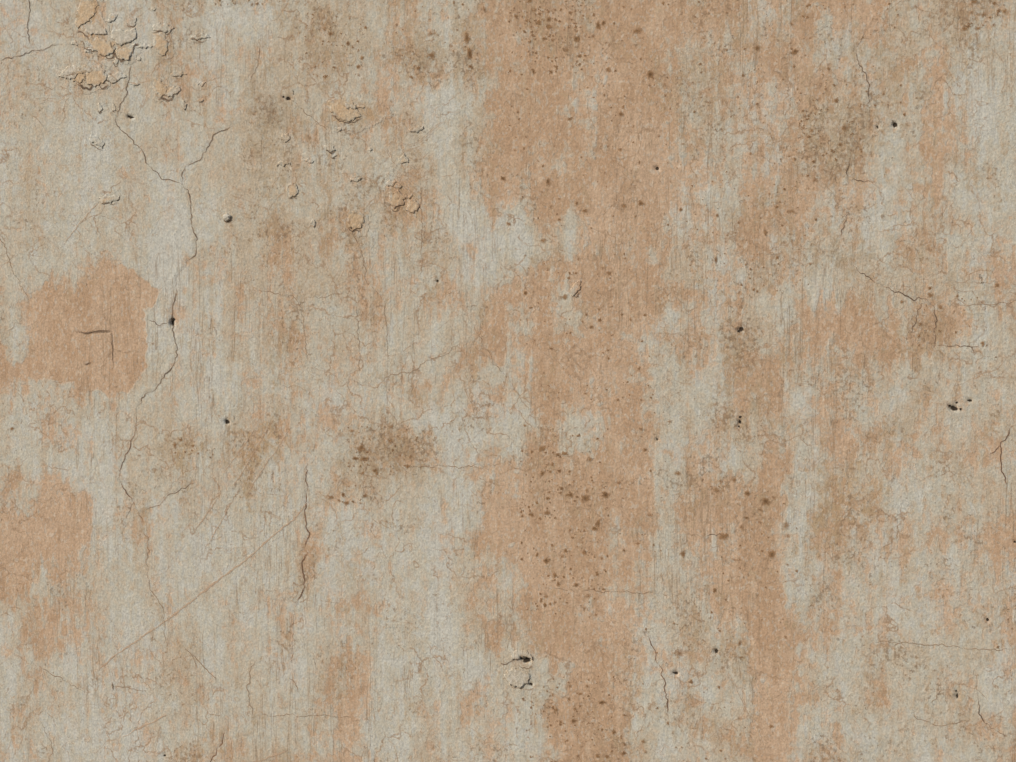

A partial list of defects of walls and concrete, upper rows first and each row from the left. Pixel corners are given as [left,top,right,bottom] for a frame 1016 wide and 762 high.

spalling [59,0,204,110]
crack [115,66,230,259]
crack [119,294,193,518]
crack [144,534,165,637]
crack [298,467,310,600]